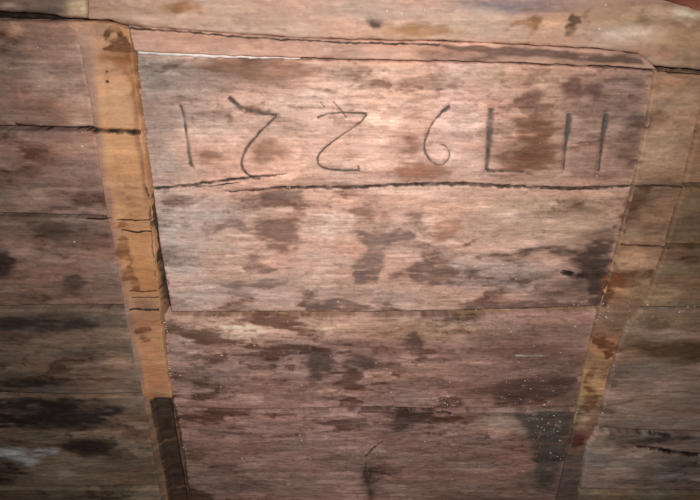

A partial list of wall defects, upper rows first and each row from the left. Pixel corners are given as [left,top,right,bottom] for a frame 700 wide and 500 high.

leakage [563,78,598,97]
leakage [510,116,556,170]
leakage [353,231,415,284]
crack [86,173,686,311]
leakage [393,263,458,285]
leakage [467,241,614,309]
leakage [306,299,371,311]
leakage [592,337,618,359]
leakage [0,397,122,429]
leakage [496,377,584,486]
leakage [0,449,43,461]